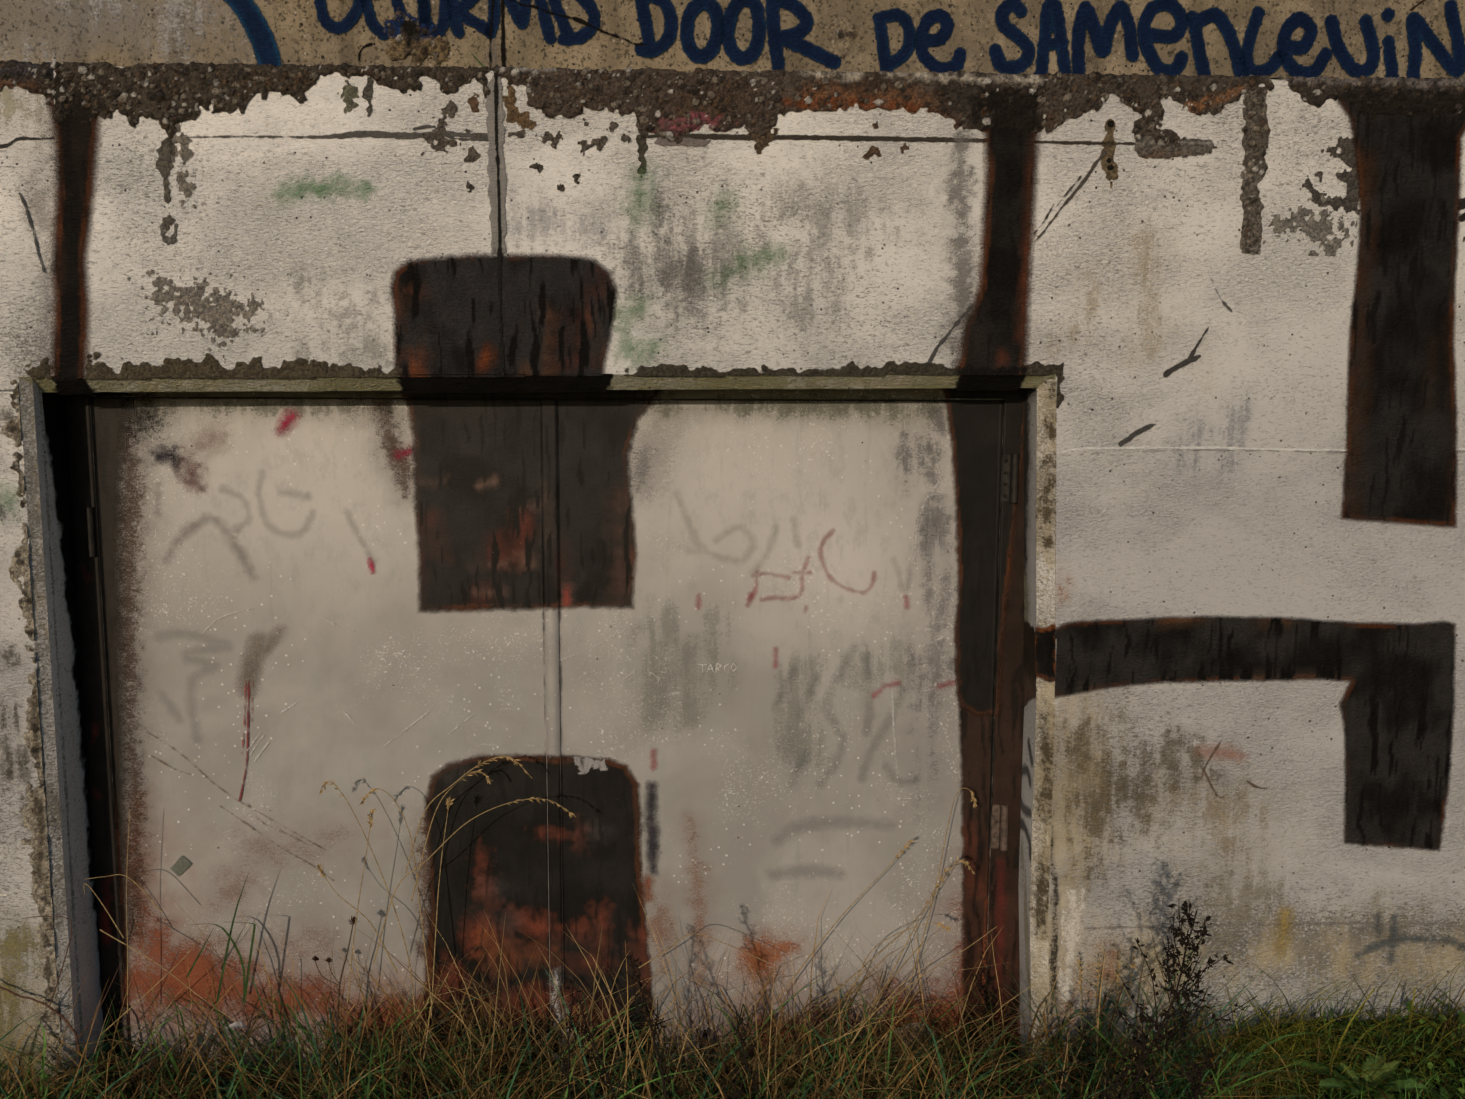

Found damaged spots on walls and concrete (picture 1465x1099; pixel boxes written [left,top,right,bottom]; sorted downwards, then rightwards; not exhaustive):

crack [489,0,648,69]
spalling [0,7,1465,162]
peeling [1263,136,1360,257]
spalling [84,268,403,379]
water stain [1036,383,1057,548]
water stain [1,746,29,812]
spalling [2,357,62,1080]
rust [120,794,426,1051]
rust [701,895,988,1069]
water stain [1020,712,1223,1070]